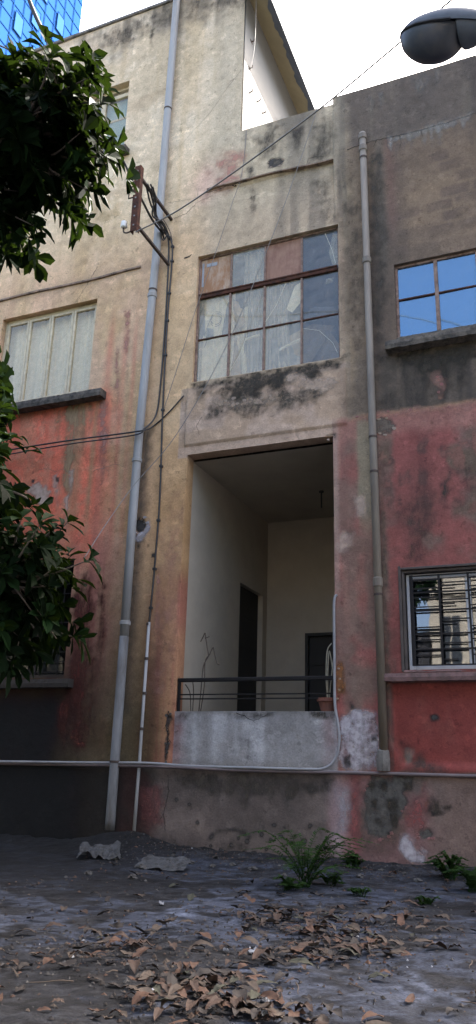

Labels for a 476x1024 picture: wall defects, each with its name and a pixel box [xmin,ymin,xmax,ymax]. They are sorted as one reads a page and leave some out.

damp [193,358,342,418]
spalling [136,516,150,541]
crack [159,711,171,824]
spalling [338,710,435,863]